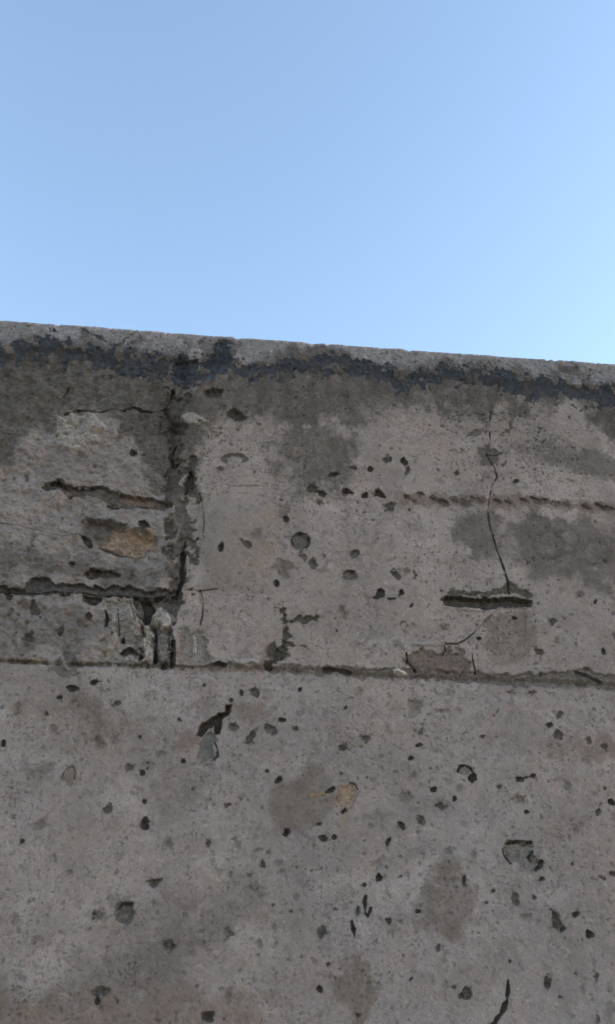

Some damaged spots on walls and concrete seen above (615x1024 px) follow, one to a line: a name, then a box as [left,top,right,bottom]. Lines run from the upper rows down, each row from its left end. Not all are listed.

damp [0,327,615,496]
crack [469,374,511,594]
spalling [42,388,224,670]
damp [451,510,615,591]
crack [0,577,218,625]
spalling [440,581,533,620]
crack [440,614,492,675]
spalling [181,687,298,763]
spalling [502,840,545,881]